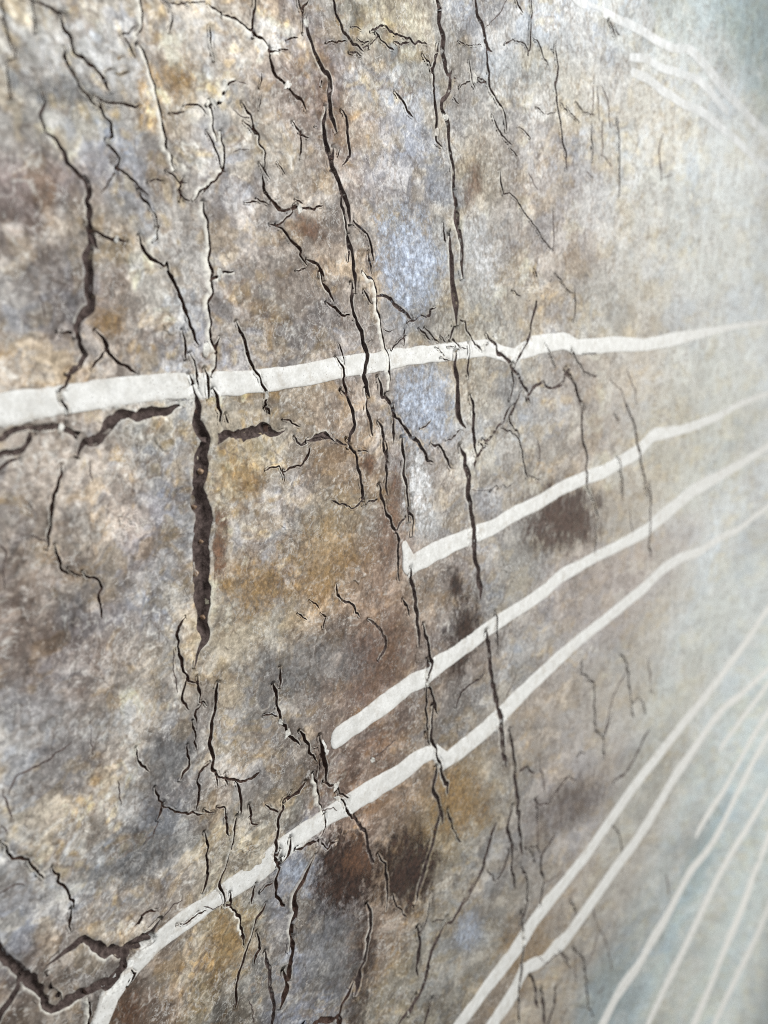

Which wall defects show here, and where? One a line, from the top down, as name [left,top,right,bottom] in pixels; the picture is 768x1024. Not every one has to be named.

crack [505,0,622,197]
crack [659,134,673,181]
crack [0,0,600,1024]
leakage [521,480,603,557]
crack [609,370,653,556]
crack [580,653,655,784]
crack [611,824,623,853]
leakage [283,824,441,1024]
crack [534,907,613,1019]